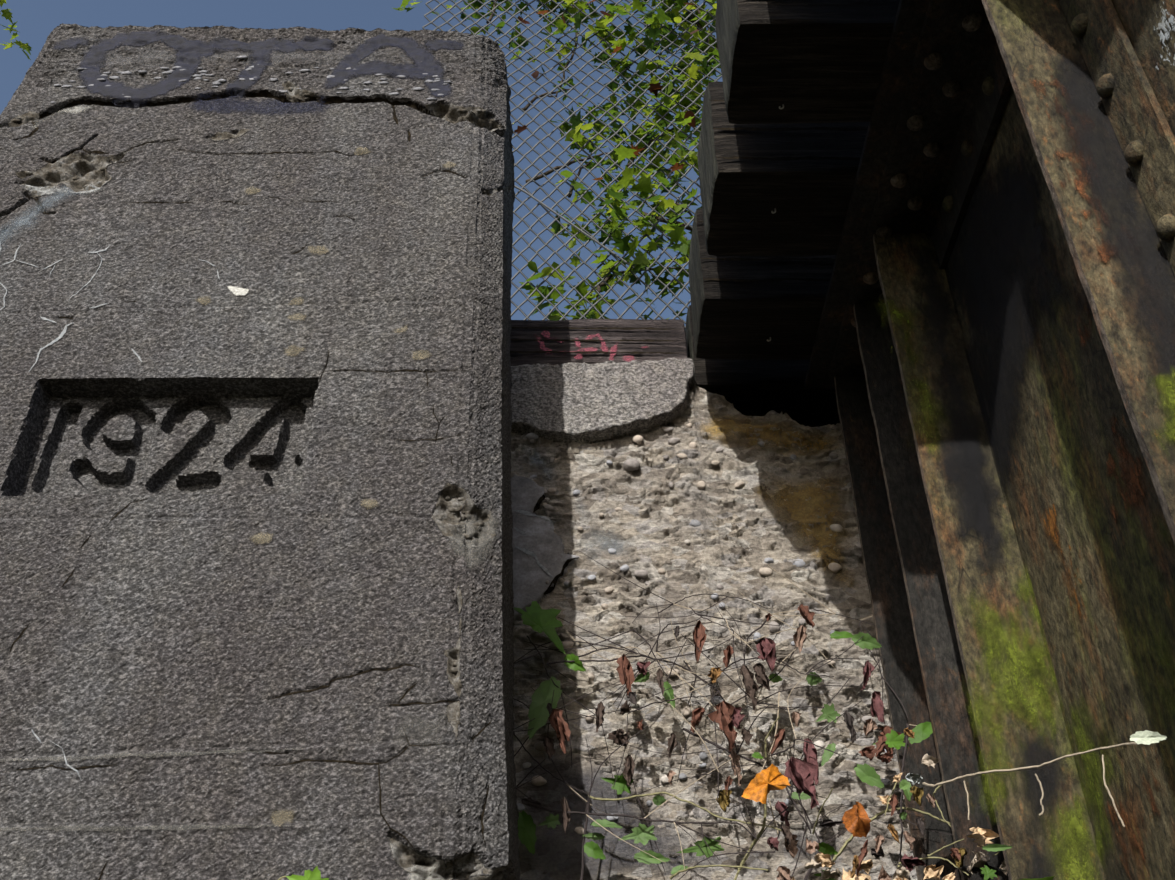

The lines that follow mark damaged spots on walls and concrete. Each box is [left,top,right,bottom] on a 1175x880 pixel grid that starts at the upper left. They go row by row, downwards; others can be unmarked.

peeling [1154,2,1175,69]
peeling [54,56,259,97]
crack [16,89,433,164]
spalling [269,67,351,103]
spalling [363,73,502,132]
crack [4,197,49,216]
spalling [16,150,129,198]
leakage [1056,57,1175,381]
leakage [911,140,1092,568]
spalling [389,382,917,880]
crack [199,664,492,852]
leakage [1023,737,1058,815]